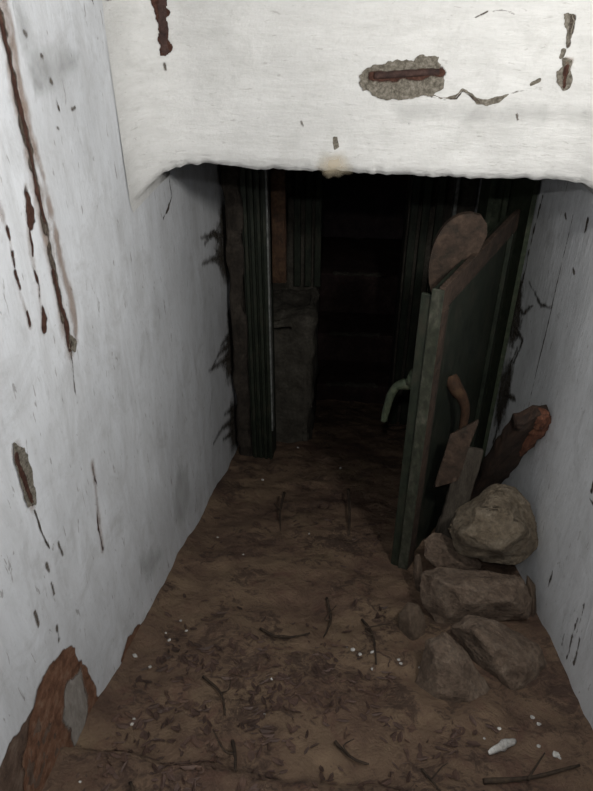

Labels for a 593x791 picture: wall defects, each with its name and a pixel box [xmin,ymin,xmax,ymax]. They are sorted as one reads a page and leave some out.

spalling [151,0,173,70]
spalling [359,54,446,100]
crack [431,78,541,106]
spalling [556,13,576,91]
spalling [13,442,37,507]
peeling [0,646,98,791]